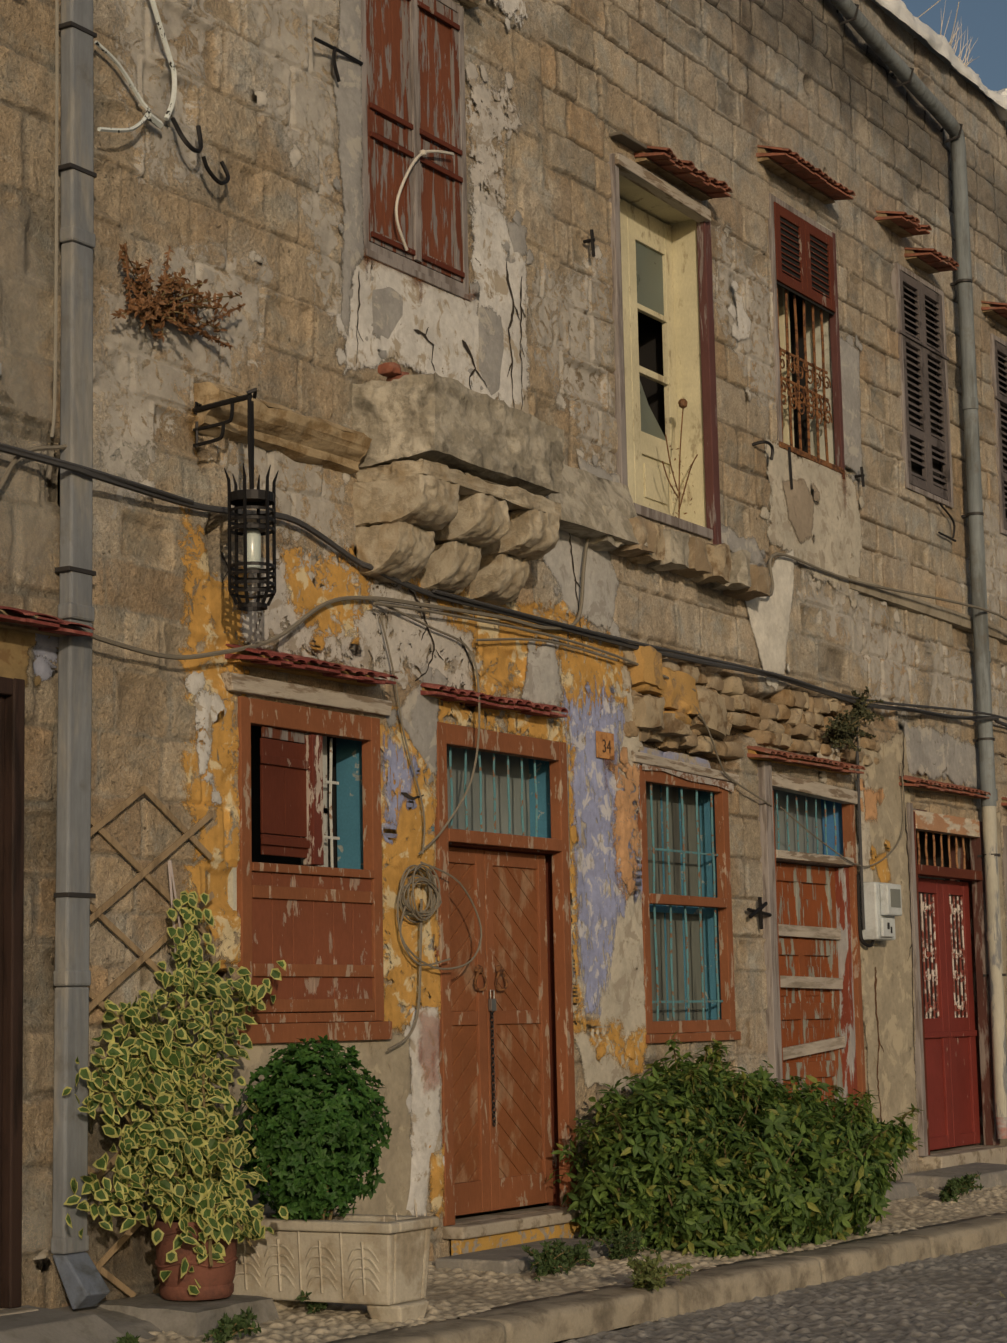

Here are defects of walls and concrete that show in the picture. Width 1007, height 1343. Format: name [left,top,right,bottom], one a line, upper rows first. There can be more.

peeling [103,0,221,197]
flaking render [228,0,618,474]
crack [414,261,525,409]
peeling [380,705,445,1231]
peeling [178,439,734,1103]